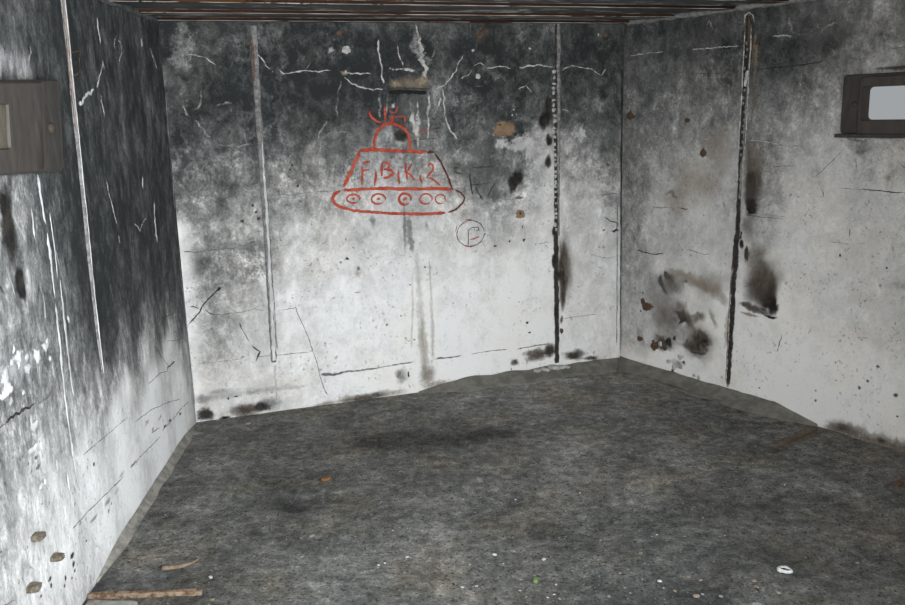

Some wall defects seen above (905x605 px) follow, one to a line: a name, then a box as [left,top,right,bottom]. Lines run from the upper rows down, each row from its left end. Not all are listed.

leakage [558,247,570,334]
leakage [741,262,778,319]
leakage [0,176,84,489]
crack [151,287,327,394]
leakage [678,305,715,352]
peeling [0,337,51,406]
crack [0,395,50,428]
peeling [28,414,40,455]
leakage [827,424,905,452]